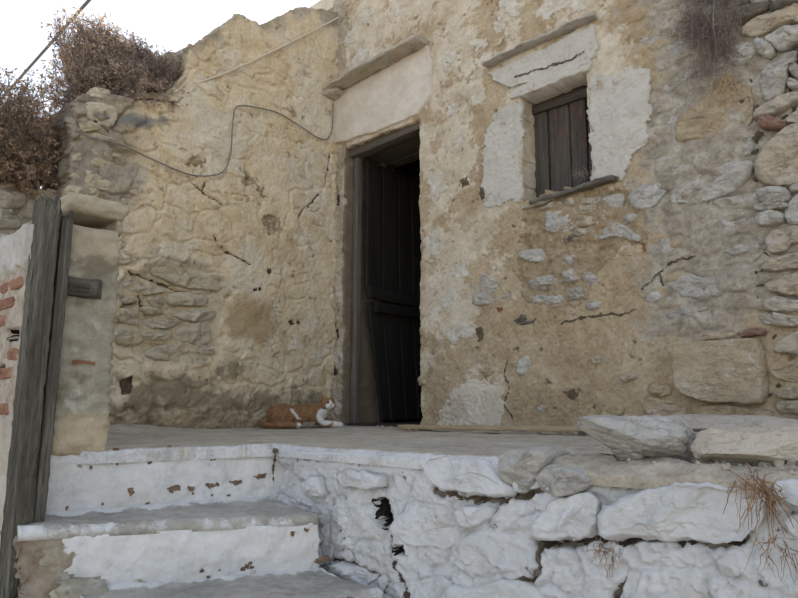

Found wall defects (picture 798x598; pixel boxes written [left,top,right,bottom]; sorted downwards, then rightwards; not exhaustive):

crack [191,183,222,205]
crack [298,155,330,218]
crack [213,236,251,265]
crack [120,271,181,316]
crack [503,359,513,419]
peeling [205,480,242,496]